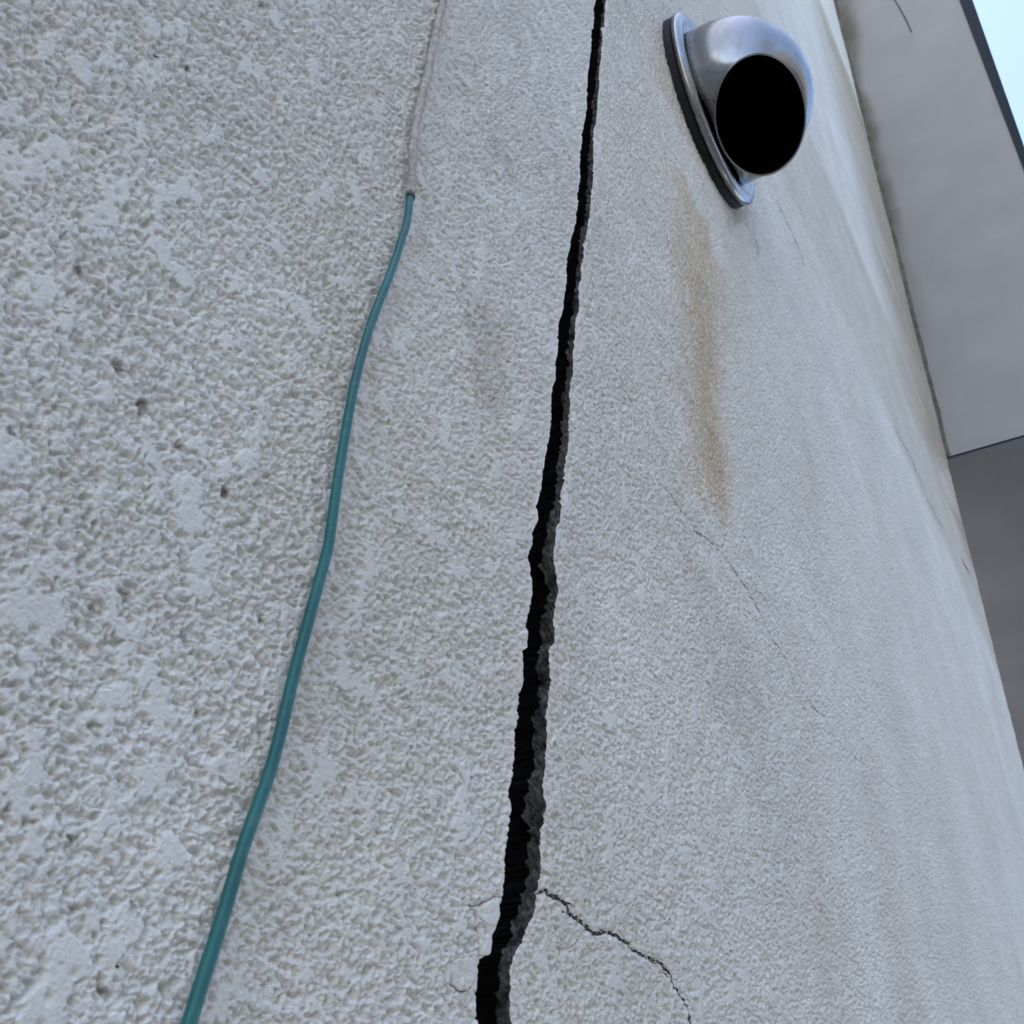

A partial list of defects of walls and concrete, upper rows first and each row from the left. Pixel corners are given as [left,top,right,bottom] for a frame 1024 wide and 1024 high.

crack [468,0,691,1024]